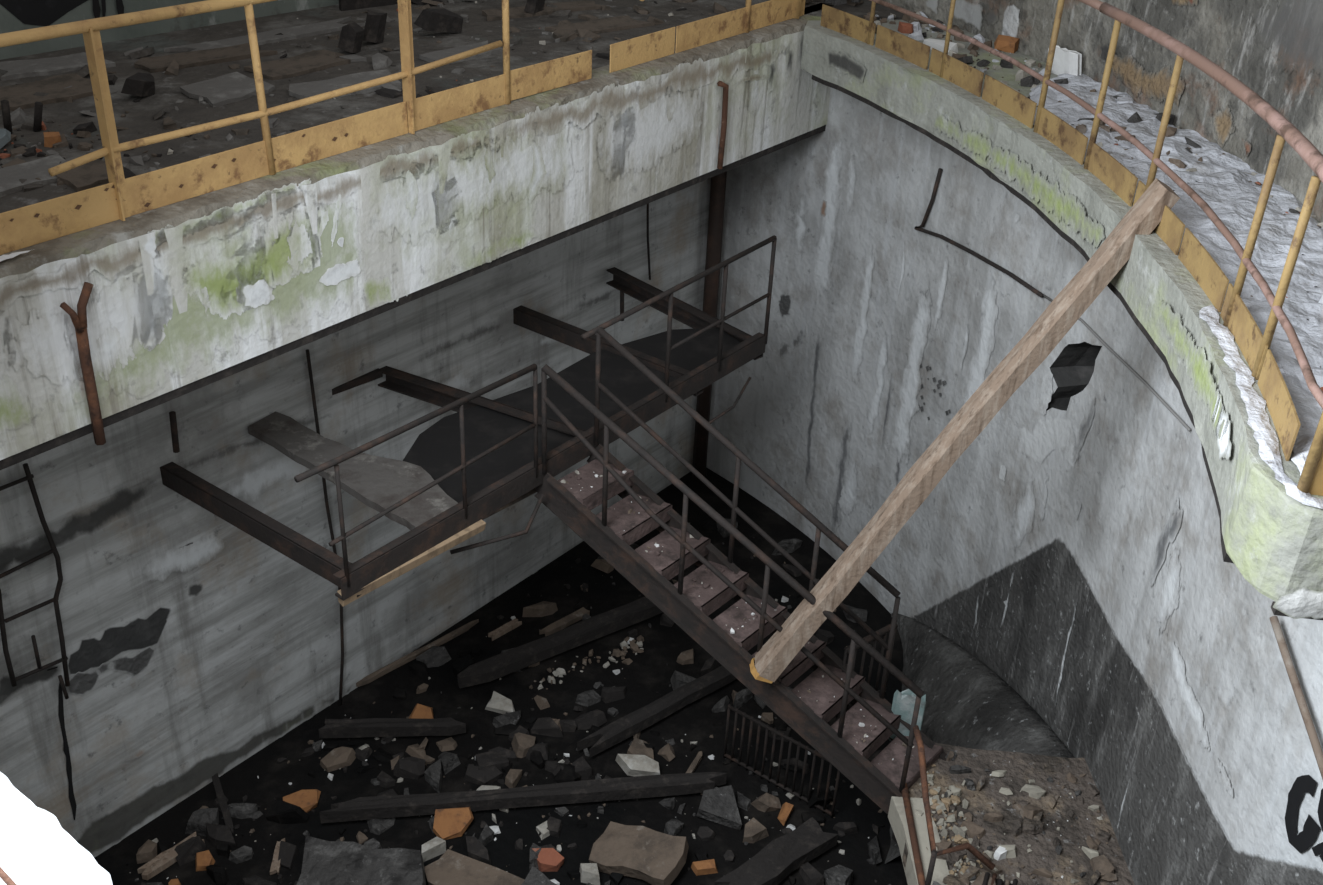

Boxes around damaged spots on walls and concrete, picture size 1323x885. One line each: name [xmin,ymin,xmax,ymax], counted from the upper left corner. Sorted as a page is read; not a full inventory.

water stain [0,35,803,388]
rust [60,282,106,445]
water stain [441,373,477,391]
peeling [1018,342,1102,468]
water stain [0,478,158,579]
water stain [135,531,231,582]
water stain [225,456,328,502]